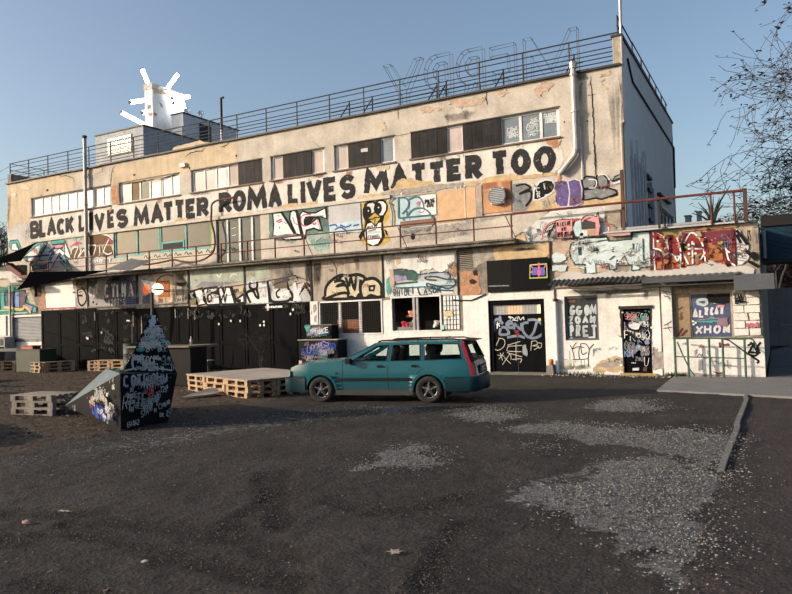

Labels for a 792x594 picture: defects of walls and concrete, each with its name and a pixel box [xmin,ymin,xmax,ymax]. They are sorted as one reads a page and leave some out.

peeling [534,81,554,96]